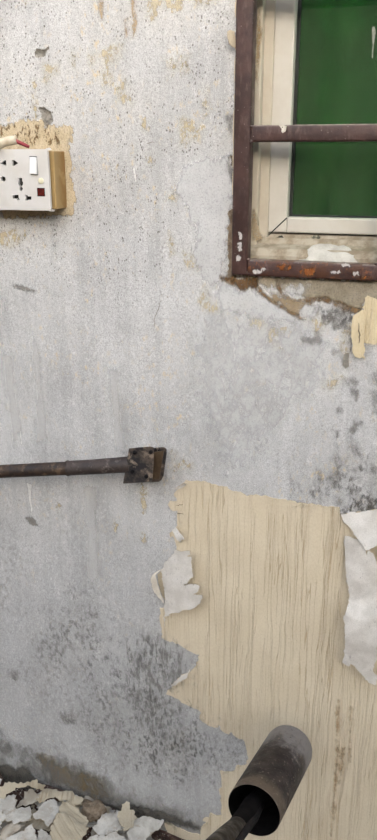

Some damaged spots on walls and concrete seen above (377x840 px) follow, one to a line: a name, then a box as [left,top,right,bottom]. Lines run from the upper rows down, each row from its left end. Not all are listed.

corrosion [221,276,258,291]
water stain [257,278,360,329]
water stain [339,477,377,512]
peeling [151,527,203,626]
peeling [341,510,377,685]
water stain [129,638,181,736]
water stain [22,750,124,806]